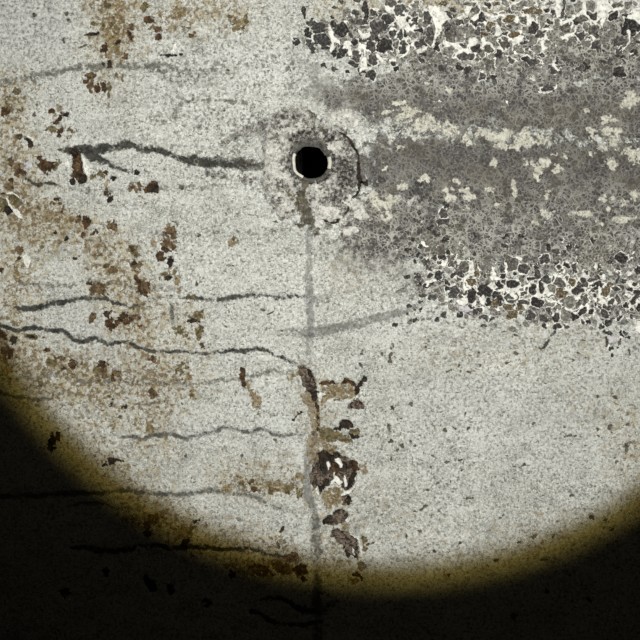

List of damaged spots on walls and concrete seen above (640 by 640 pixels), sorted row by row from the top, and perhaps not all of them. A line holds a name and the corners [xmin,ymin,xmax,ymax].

peeling [291,0,640,82]
peeling [538,83,557,94]
rust [5,155,62,191]
rust [128,169,159,199]
crack [58,139,256,173]
crack [323,131,368,224]
water stain [295,1,640,326]
rust [89,307,142,332]
crack [0,282,305,385]
rust [151,221,197,305]
water stain [286,179,332,355]
peeling [392,201,640,357]